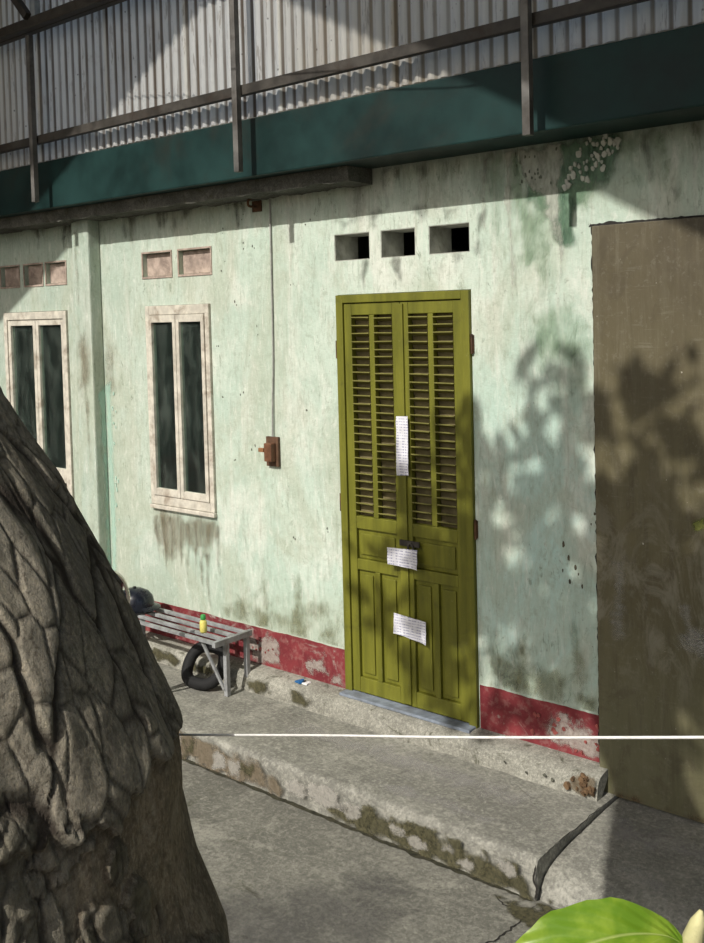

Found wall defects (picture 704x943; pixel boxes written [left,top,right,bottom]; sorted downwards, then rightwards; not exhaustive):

water stain [527,133,621,246]
water stain [161,513,213,552]
peeling [250,633,279,663]
peeling [306,660,341,684]
peeling [548,713,600,757]
water stain [358,805,375,827]
water stain [389,817,461,861]
crack [485,806,602,943]